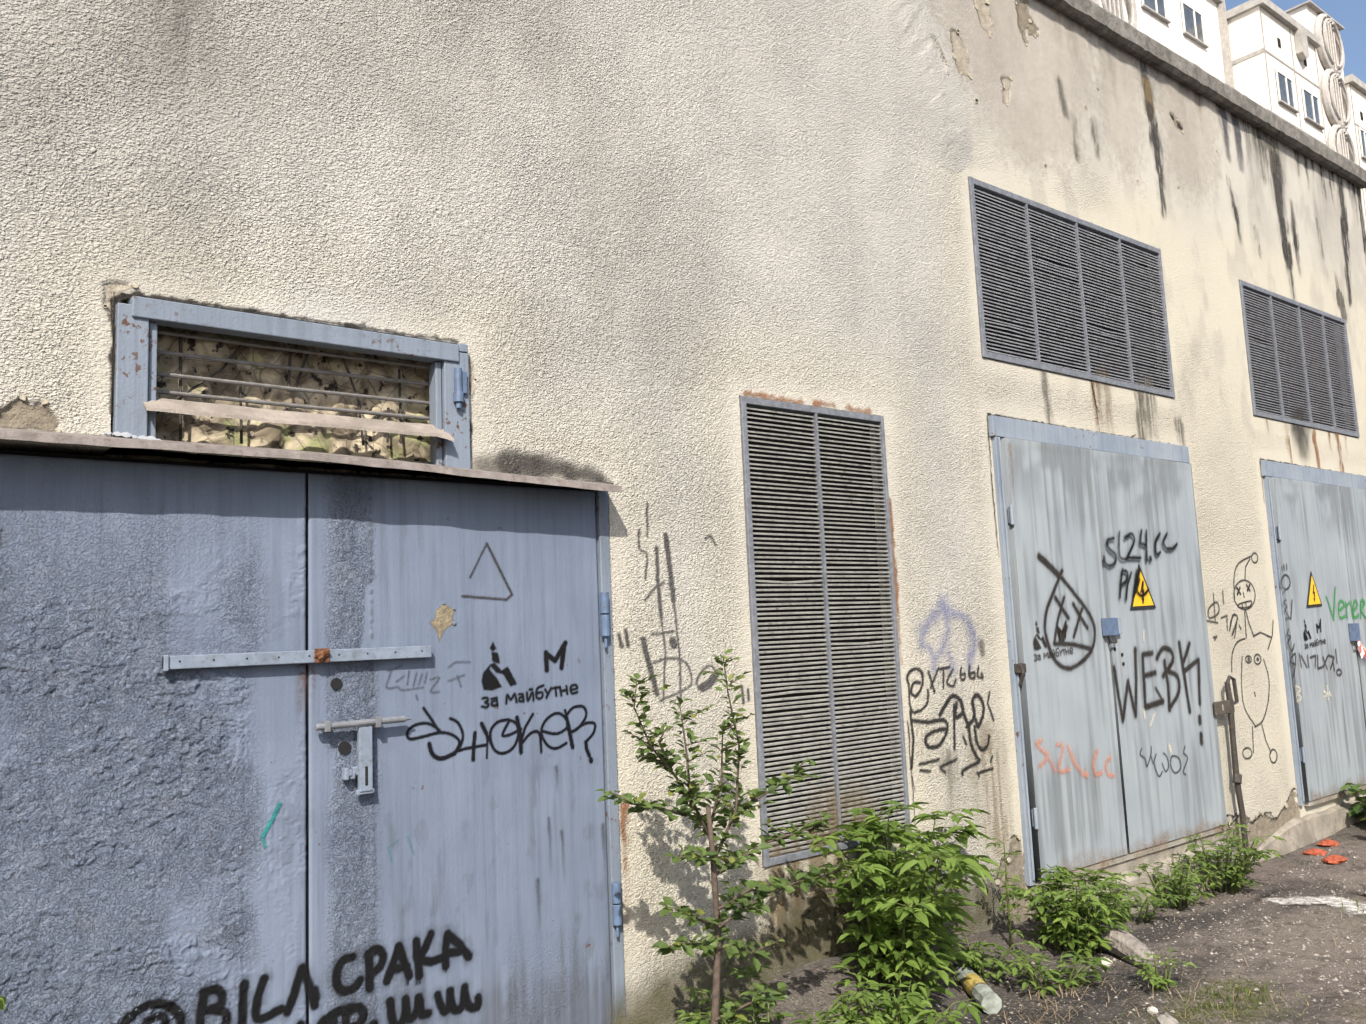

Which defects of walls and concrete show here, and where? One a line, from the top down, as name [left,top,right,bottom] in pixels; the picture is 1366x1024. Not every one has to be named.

spalling [1014,0,1039,46]
spalling [935,29,972,80]
spalling [1001,76,1012,106]
damp [1058,78,1099,159]
damp [1140,60,1166,214]
damp [1218,106,1366,320]
spalling [0,395,61,432]
damp [1042,370,1050,418]
damp [1137,379,1154,439]
damp [1292,410,1307,450]